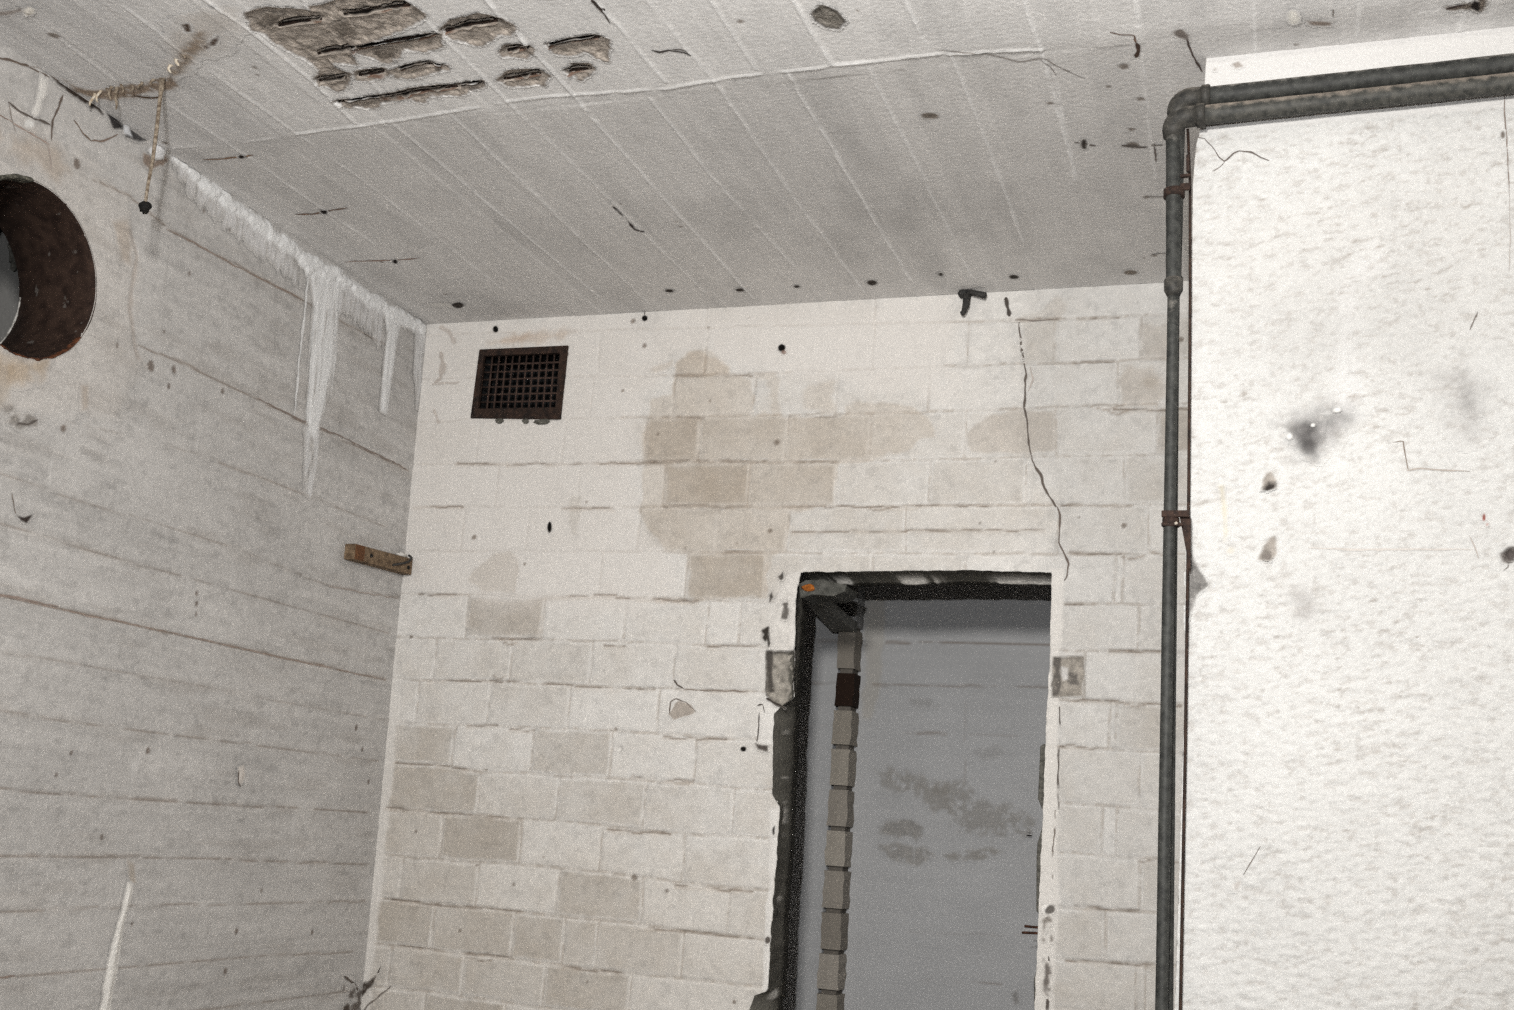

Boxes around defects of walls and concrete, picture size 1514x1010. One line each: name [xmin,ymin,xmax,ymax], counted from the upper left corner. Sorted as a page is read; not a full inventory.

spalling [240,0,614,111]
damp [165,152,459,501]
damp [636,348,938,603]
damp [965,403,1060,458]
crack [1003,297,1070,581]
damp [1004,293,1070,365]